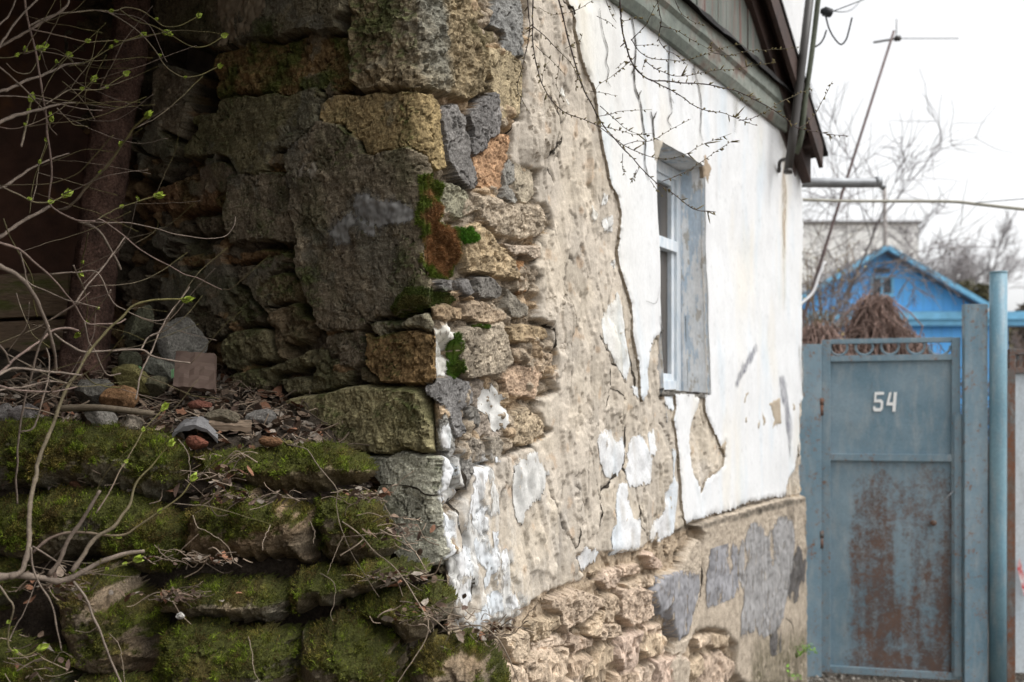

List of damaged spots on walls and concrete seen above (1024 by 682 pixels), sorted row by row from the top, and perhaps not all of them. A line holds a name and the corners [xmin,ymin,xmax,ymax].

spalling [416,0,807,682]